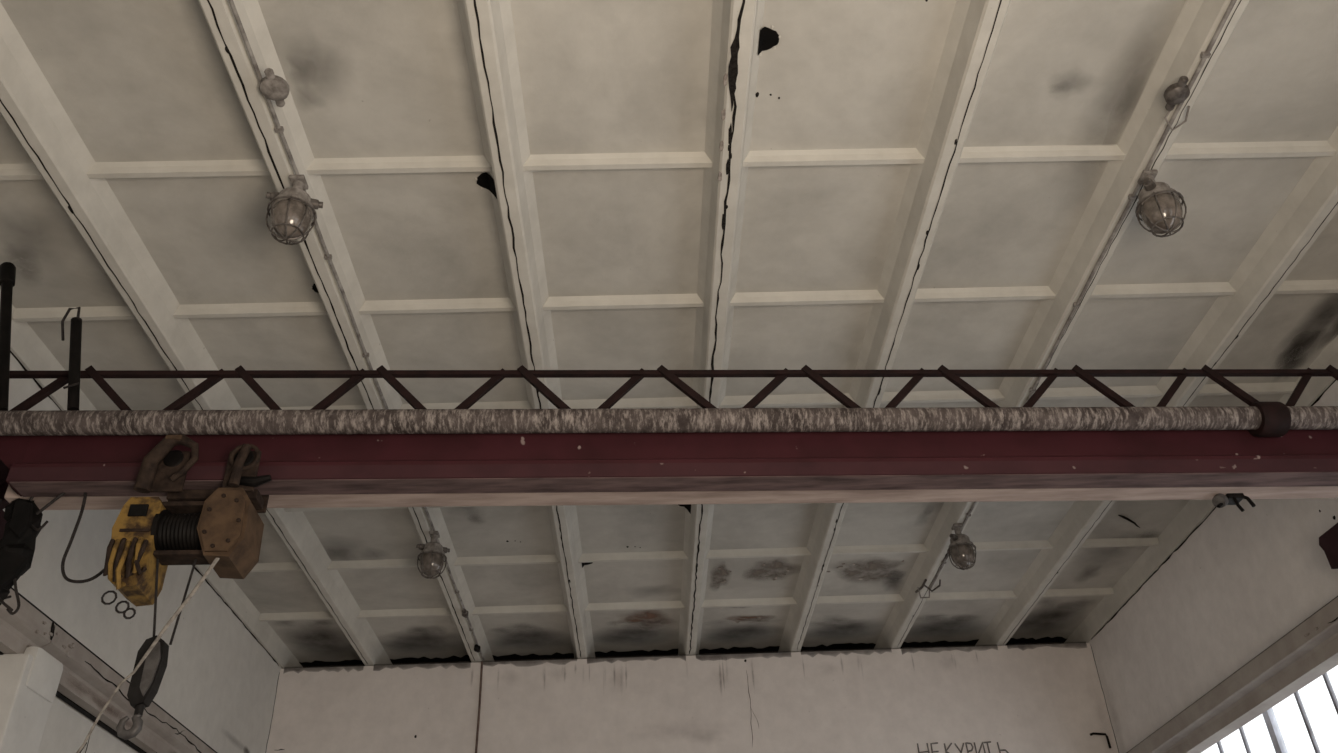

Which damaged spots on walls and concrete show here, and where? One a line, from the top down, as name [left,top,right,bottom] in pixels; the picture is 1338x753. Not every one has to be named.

crack [474,0,541,409]
crack [709,0,745,403]
crack [556,506,581,657]
crack [689,504,703,654]